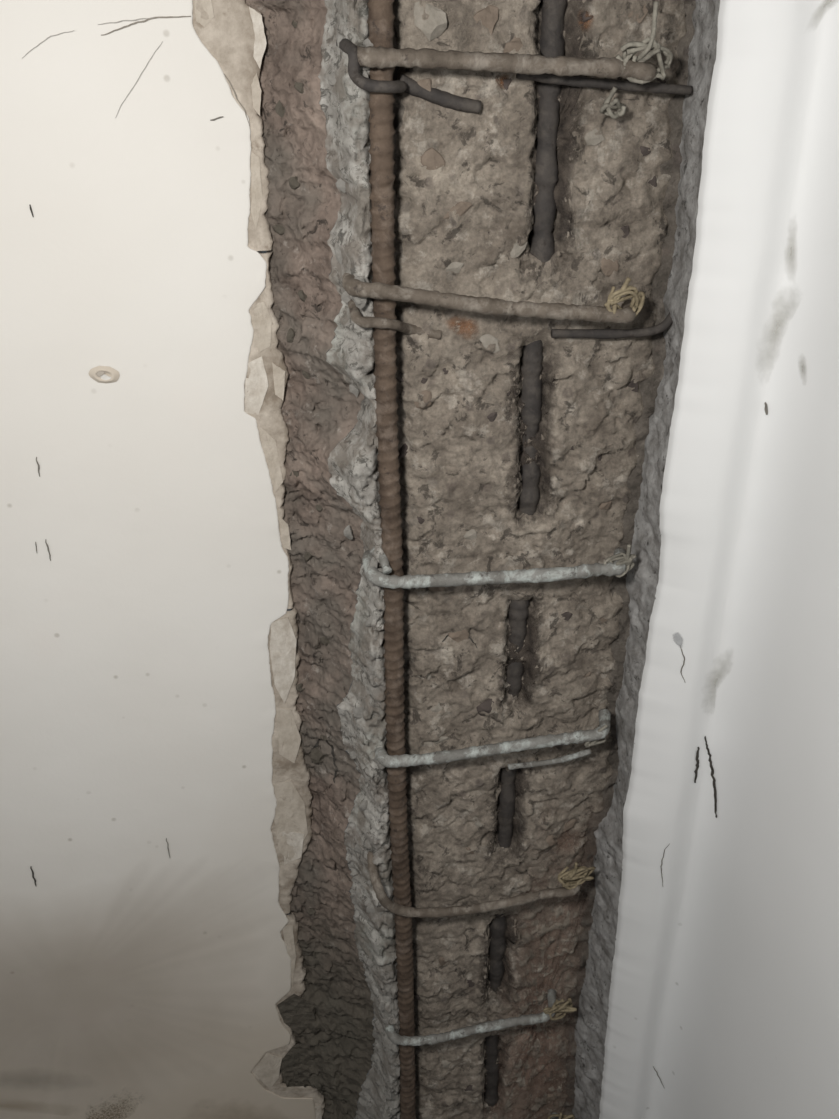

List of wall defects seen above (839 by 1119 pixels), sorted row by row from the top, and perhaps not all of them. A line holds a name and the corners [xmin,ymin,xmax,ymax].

corrosion [523,81,546,277]
corrosion [552,75,581,265]
corrosion [508,351,555,521]
spalling [192,0,375,1119]
corrosion [500,599,542,707]
spalling [393,0,720,1119]
corrosion [487,768,532,863]